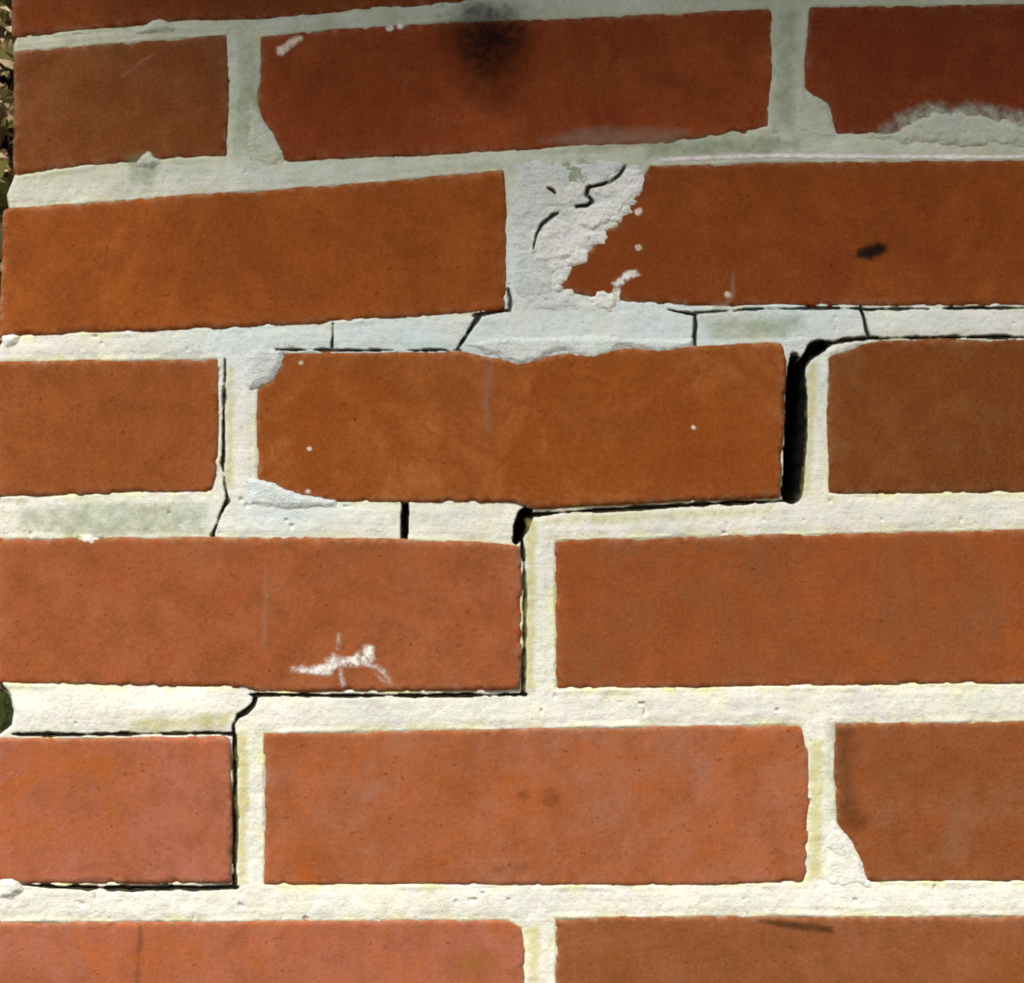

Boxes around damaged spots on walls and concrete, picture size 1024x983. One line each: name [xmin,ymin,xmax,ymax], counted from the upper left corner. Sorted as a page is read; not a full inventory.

spalling [510,159,645,313]
crack [533,167,625,248]
crack [277,289,511,352]
crack [13,307,1024,892]